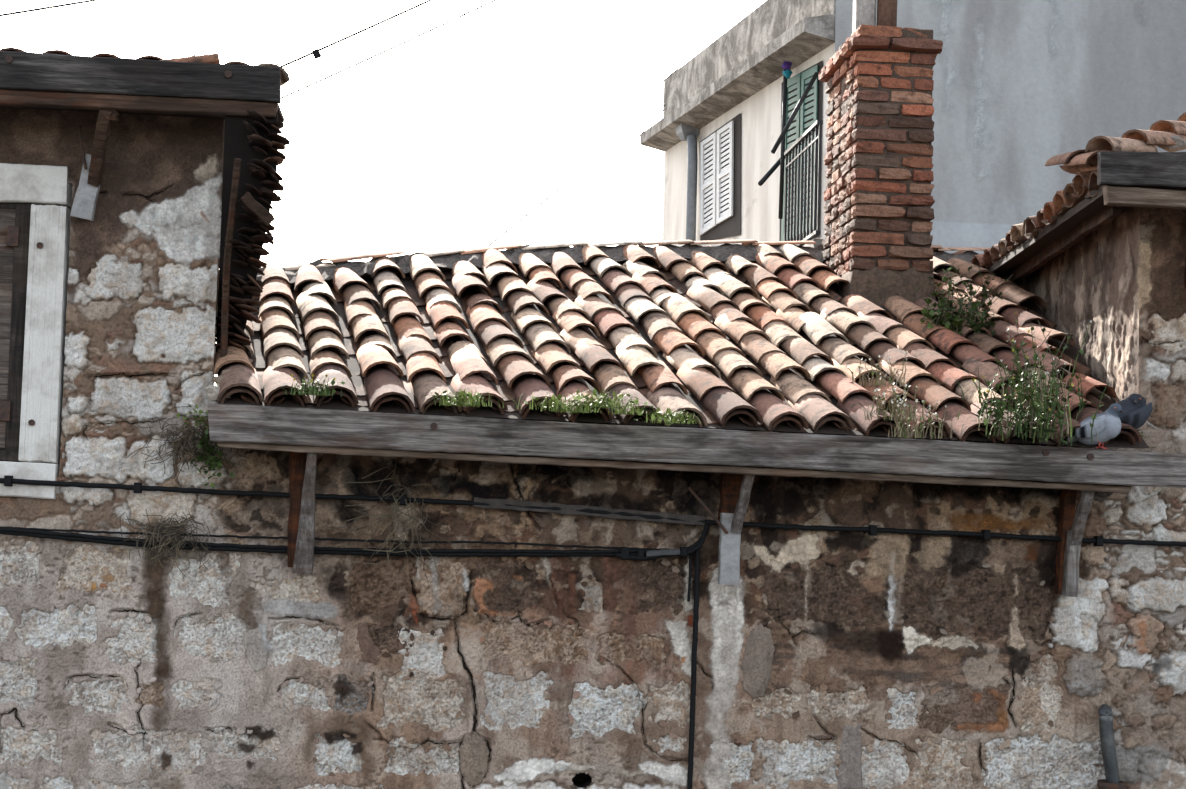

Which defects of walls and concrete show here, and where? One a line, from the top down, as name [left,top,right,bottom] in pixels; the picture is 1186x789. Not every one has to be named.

peeling [120,155,221,264]
leakage [146,525,172,681]
crack [366,558,582,789]
spalling [751,516,1106,789]
peeling [1153,656,1173,671]
spalling [710,737,842,789]